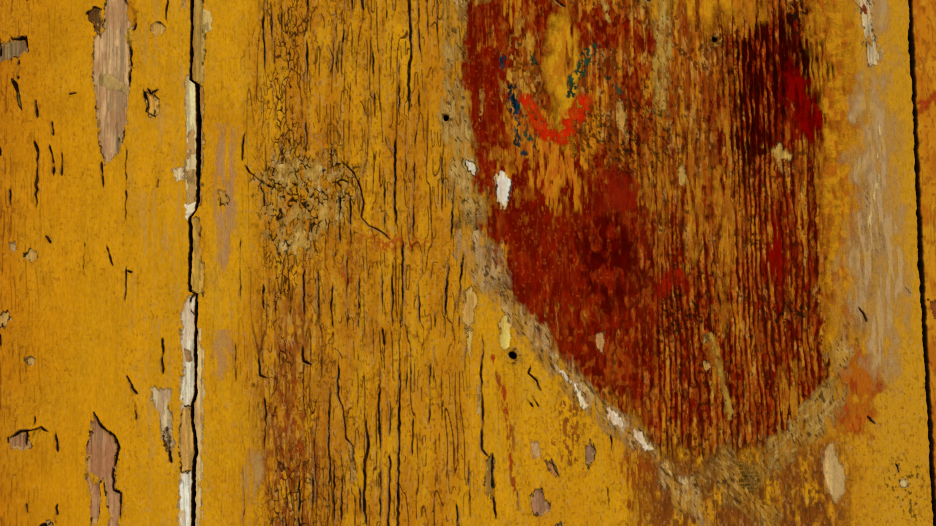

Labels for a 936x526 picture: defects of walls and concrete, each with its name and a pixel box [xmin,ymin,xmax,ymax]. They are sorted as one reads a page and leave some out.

crack [0,37,63,206]
peeling [86,0,139,163]
spalling [150,0,213,526]
peeling [214,138,236,266]
crack [262,8,282,68]
crack [241,123,464,345]
crack [386,0,438,112]
peeling [842,0,911,377]
crack [13,417,59,451]
peeling [84,415,120,526]
crack [285,365,443,526]
peeling [822,443,845,502]